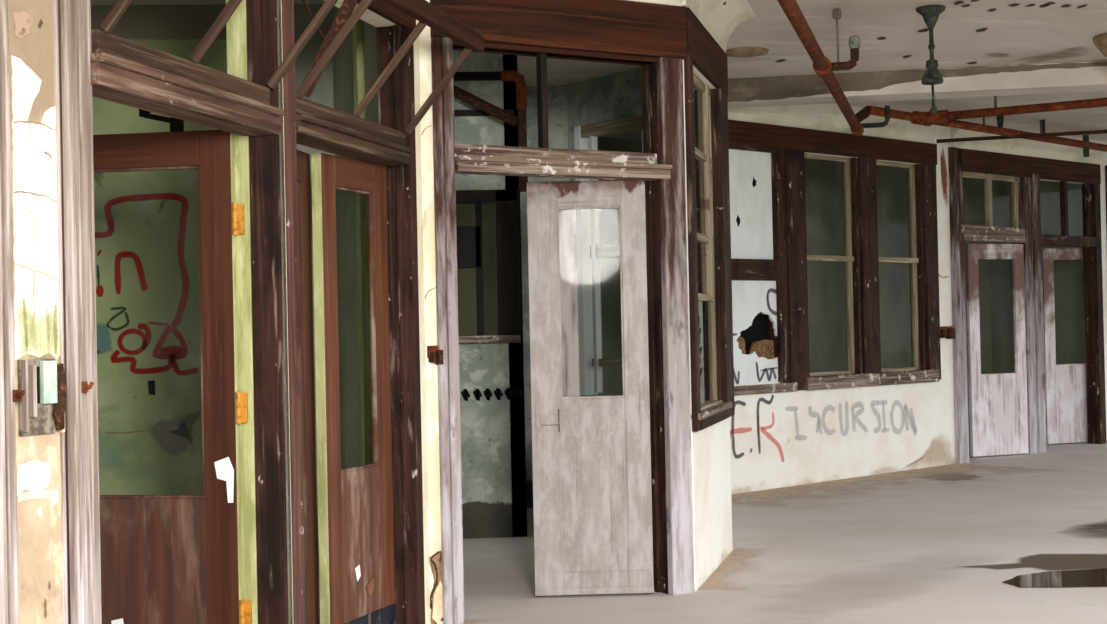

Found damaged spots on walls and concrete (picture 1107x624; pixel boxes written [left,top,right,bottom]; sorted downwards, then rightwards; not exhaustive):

crack [13,120,56,159]
peeling [11,56,60,360]
crack [14,191,59,323]
damp [21,298,59,355]
damp [912,442,943,463]
peeling [17,461,59,518]